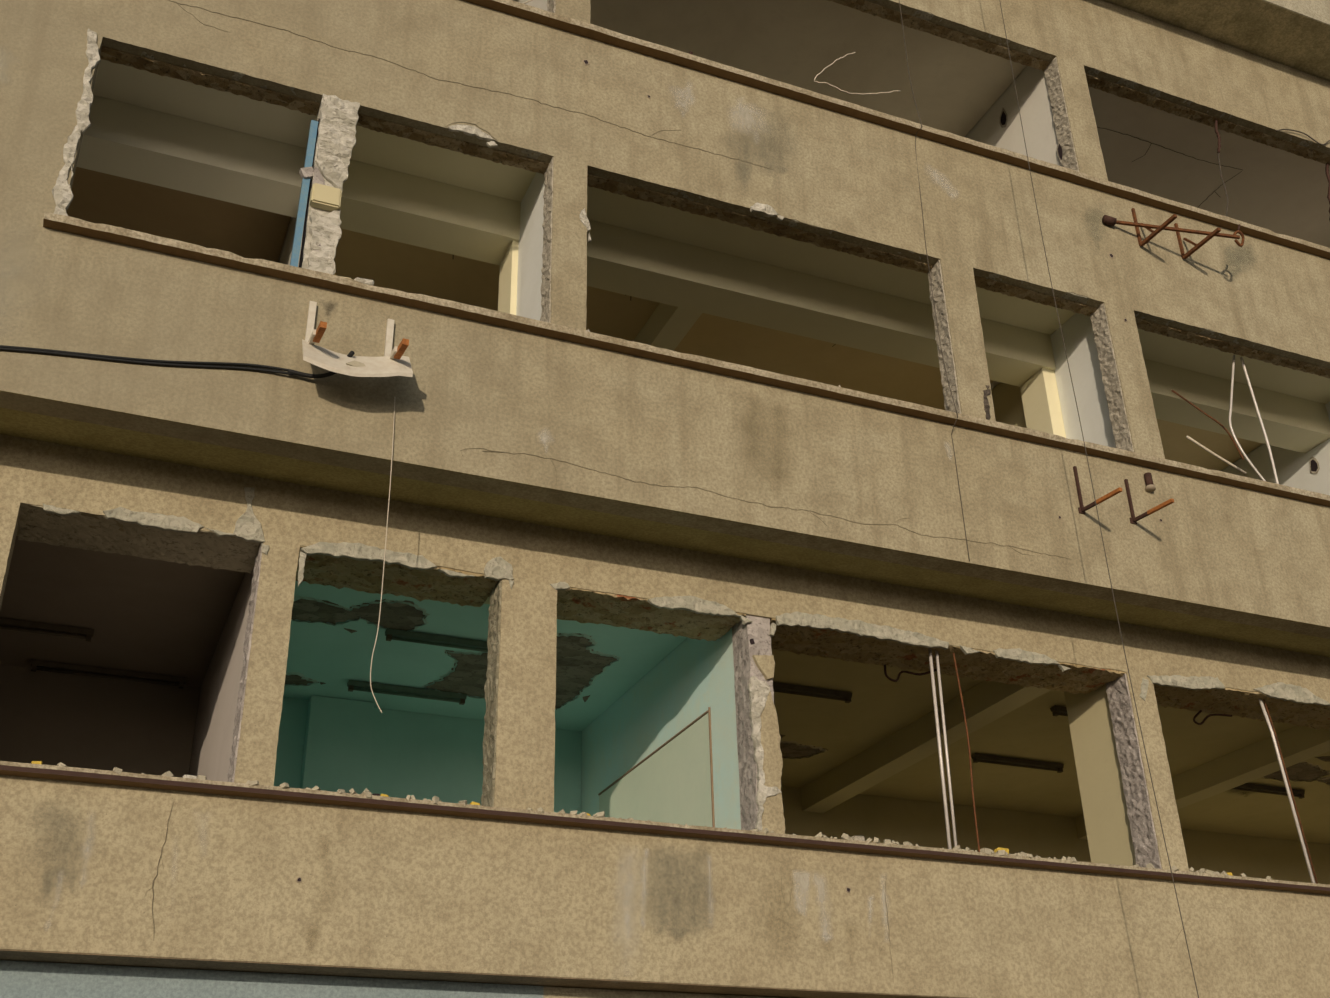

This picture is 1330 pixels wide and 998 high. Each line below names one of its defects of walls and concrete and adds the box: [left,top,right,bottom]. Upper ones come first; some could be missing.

spalling [52,28,101,216]
crack [169,0,773,170]
crack [1097,127,1242,208]
peeling [306,210,342,275]
crack [462,448,1068,559]
peeling [291,595,430,633]
peeling [284,672,326,686]
peeling [422,649,488,699]
peeling [555,633,622,710]
peeling [749,675,770,696]
peeling [1261,756,1330,785]
crack [149,805,173,941]